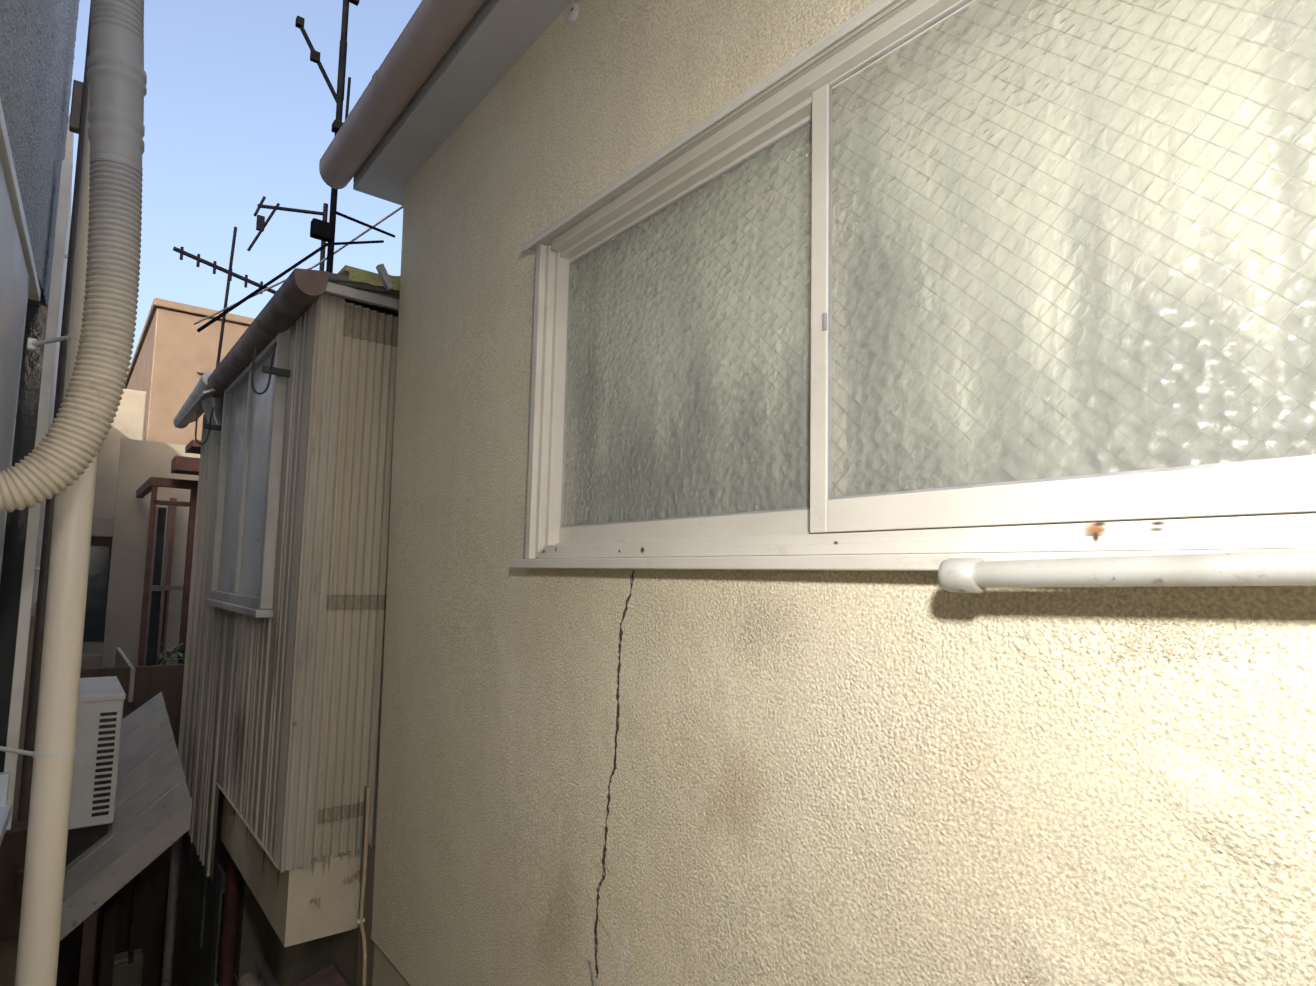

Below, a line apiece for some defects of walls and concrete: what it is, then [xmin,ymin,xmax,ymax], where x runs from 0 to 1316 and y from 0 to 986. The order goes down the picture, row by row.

corrosion [1087,522,1105,540]
crack [592,570,635,979]